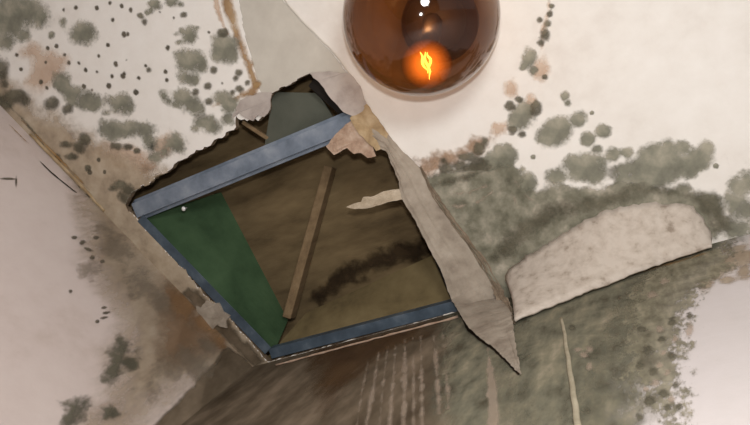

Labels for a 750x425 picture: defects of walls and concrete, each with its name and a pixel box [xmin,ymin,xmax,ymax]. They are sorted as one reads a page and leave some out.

mould [0,0,47,57]
mould [71,23,97,45]
mould [120,0,186,25]
water stain [159,0,261,133]
mould [520,4,554,79]
mould [505,97,541,137]
mould [537,111,594,146]
mould [581,124,611,152]
water stain [0,61,215,308]
water stain [47,138,750,425]